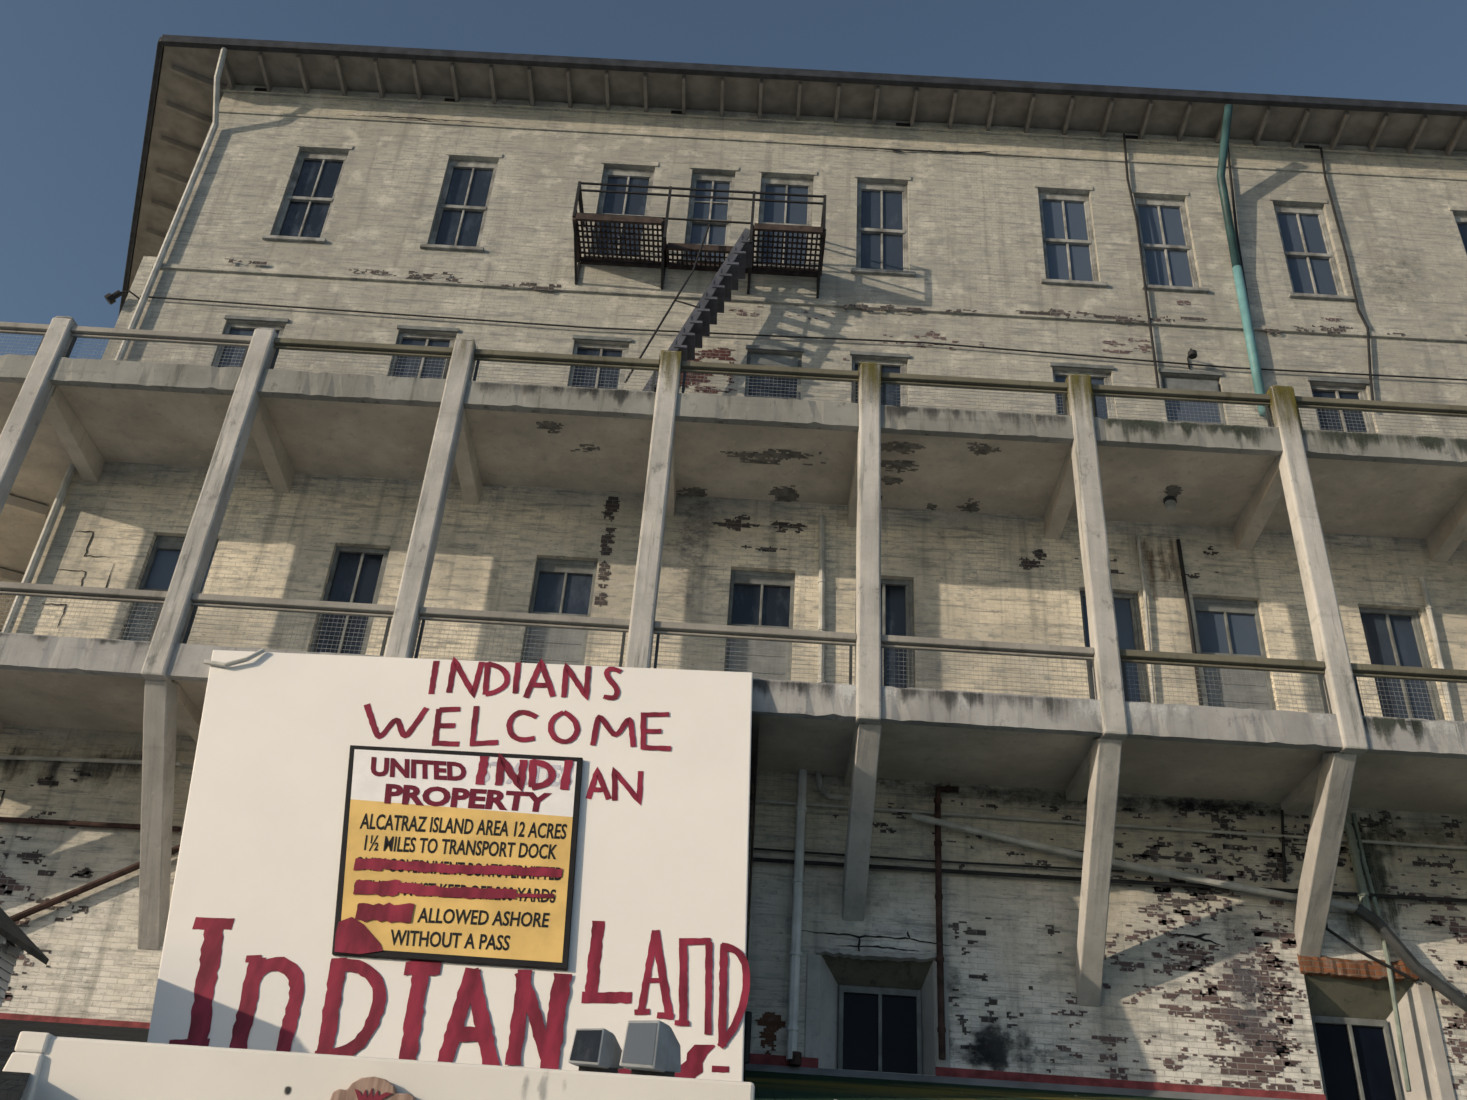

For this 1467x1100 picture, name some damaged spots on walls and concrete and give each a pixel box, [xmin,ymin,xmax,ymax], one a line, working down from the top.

peeling [720,449,826,466]
peeling [768,485,799,502]
peeling [881,441,926,500]
peeling [966,442,1001,456]
peeling [711,514,807,552]
peeling [0,836,94,927]
peeling [1334,810,1406,899]
peeling [2,946,51,1003]
peeling [948,917,991,955]
spalling [1046,801,1321,1092]
spalling [1382,816,1467,1090]
leakage [963,1022,1033,1071]